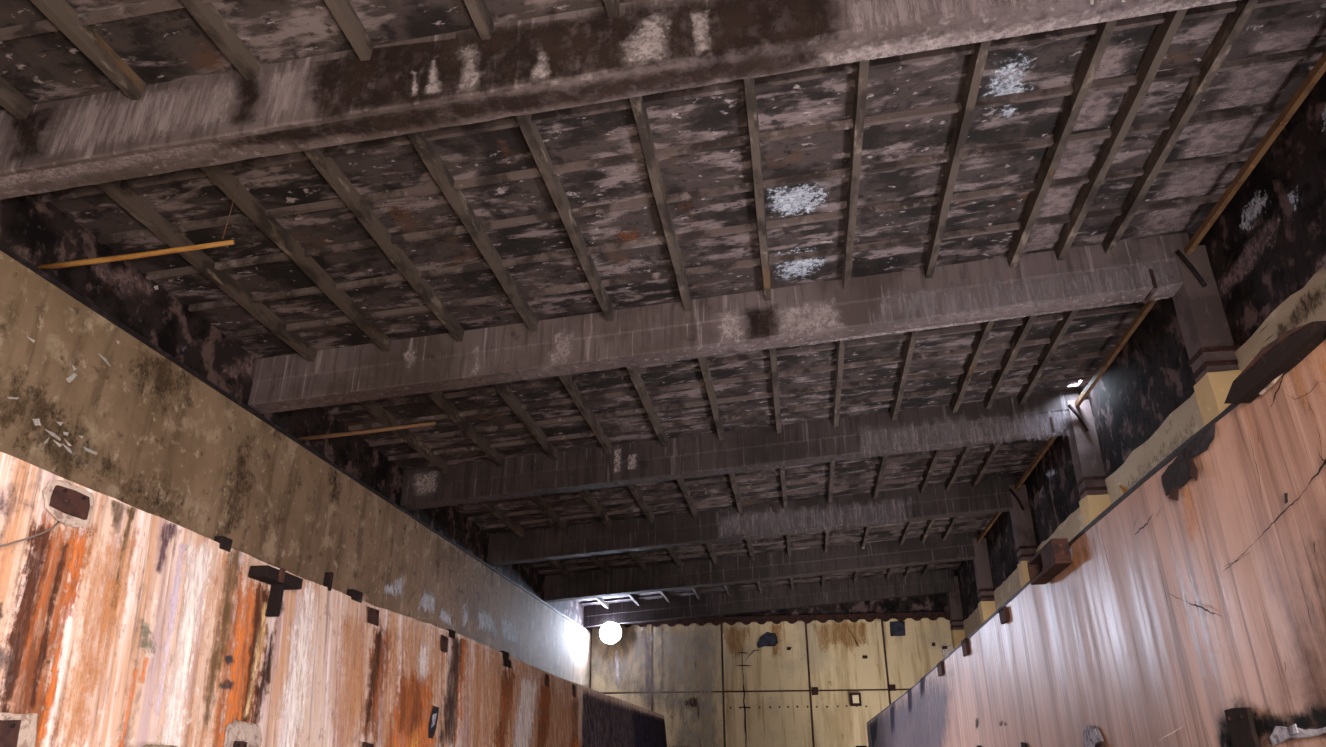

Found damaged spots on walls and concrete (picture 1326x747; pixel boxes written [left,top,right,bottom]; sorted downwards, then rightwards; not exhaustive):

leakage [1278,290,1324,337]
leakage [132,352,194,412]
crack [1222,373,1326,572]
corrosion [0,515,138,747]
corrosion [200,548,276,747]
corrosion [333,620,581,747]
crack [1296,543,1317,637]